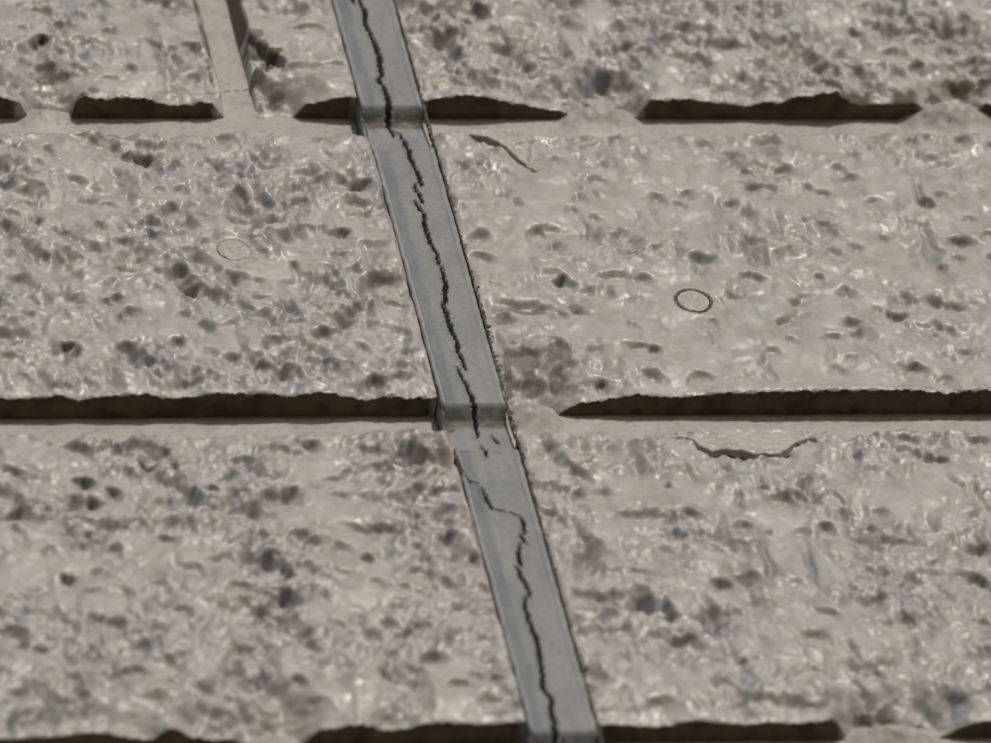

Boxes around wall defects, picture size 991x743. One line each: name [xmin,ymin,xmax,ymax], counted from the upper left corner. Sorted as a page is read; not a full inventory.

crack [331,0,605,743]